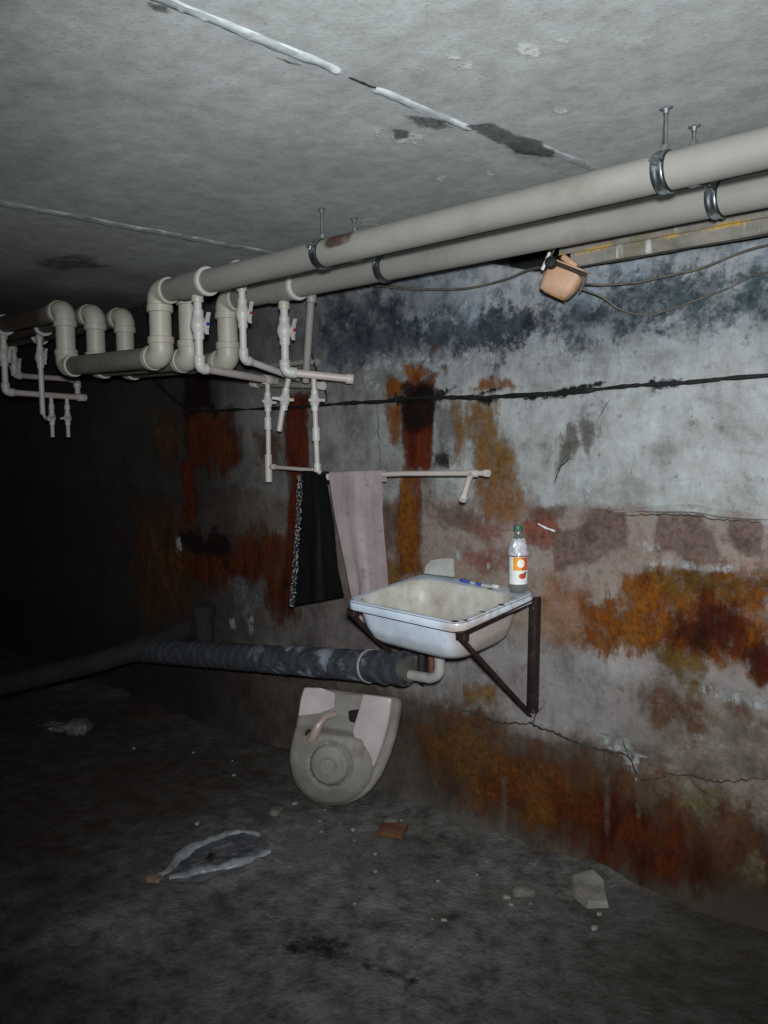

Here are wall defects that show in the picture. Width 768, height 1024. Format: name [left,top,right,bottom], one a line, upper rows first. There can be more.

damp [409,116,448,129]
damp [468,123,579,173]
damp [319,264,768,387]
rust [130,373,309,626]
rust [386,365,446,584]
rust [450,376,528,522]
rust [541,565,768,735]
crack [456,707,767,804]